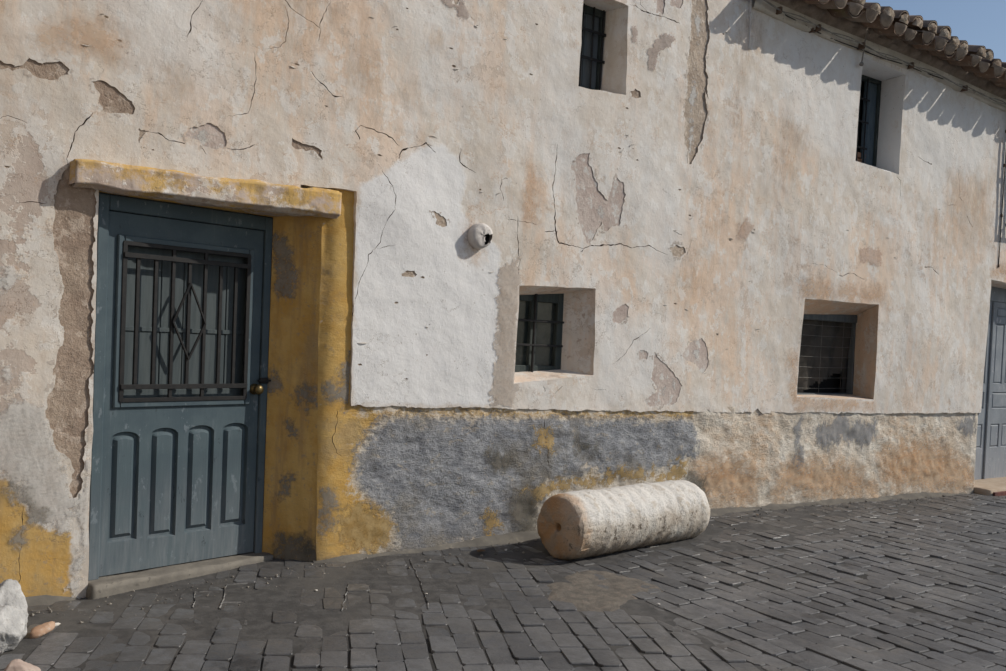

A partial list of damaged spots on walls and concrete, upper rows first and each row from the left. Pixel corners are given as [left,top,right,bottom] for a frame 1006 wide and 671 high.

flaking render [0,58,73,80]
crack [67,113,93,164]
flaking render [89,78,135,118]
crack [227,0,332,117]
peeling [442,0,478,28]
peeling [647,33,675,71]
flaking render [656,0,710,164]
crack [352,125,476,315]
crack [500,144,691,270]
flaking render [570,153,626,244]
flaking render [45,164,97,511]
flaking render [638,350,682,410]